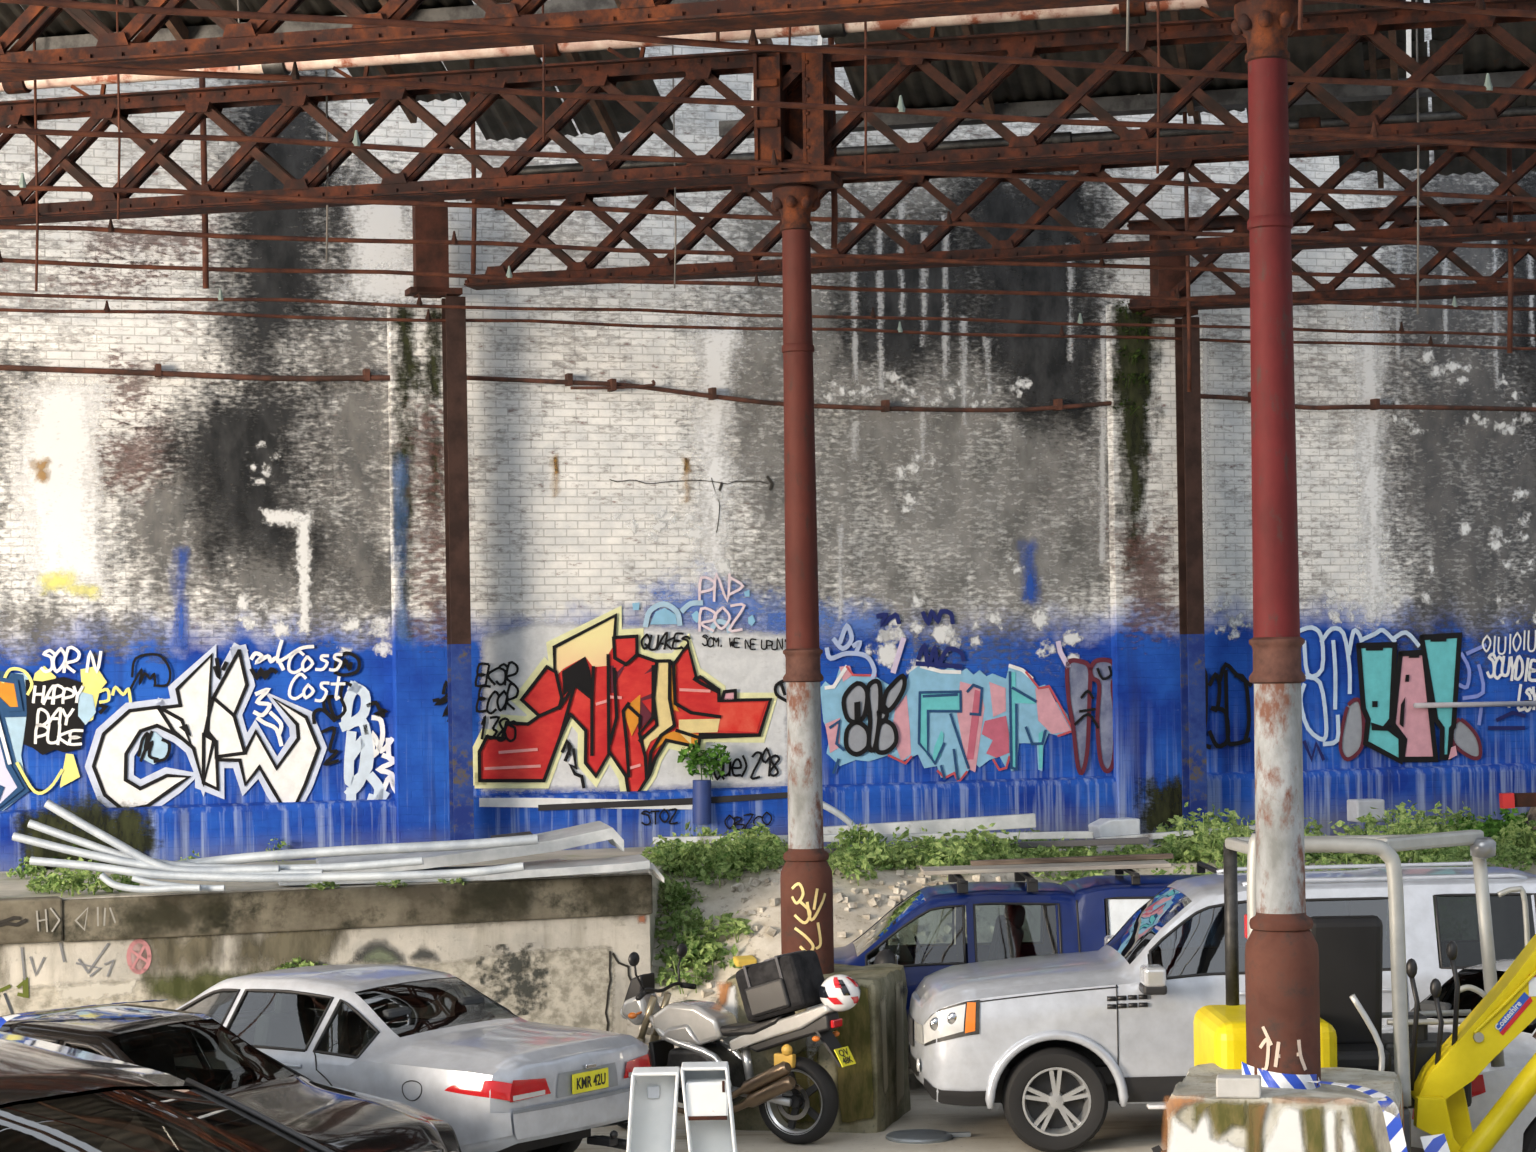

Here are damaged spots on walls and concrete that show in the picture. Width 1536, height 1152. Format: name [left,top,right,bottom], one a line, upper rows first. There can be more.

water stain [207,105,280,167]
water stain [226,101,381,192]
water stain [0,206,392,666]
water stain [673,196,785,630]
water stain [810,171,1115,660]
water stain [1359,159,1536,670]
water stain [1250,1103,1267,1152]
water stain [1371,1105,1396,1152]